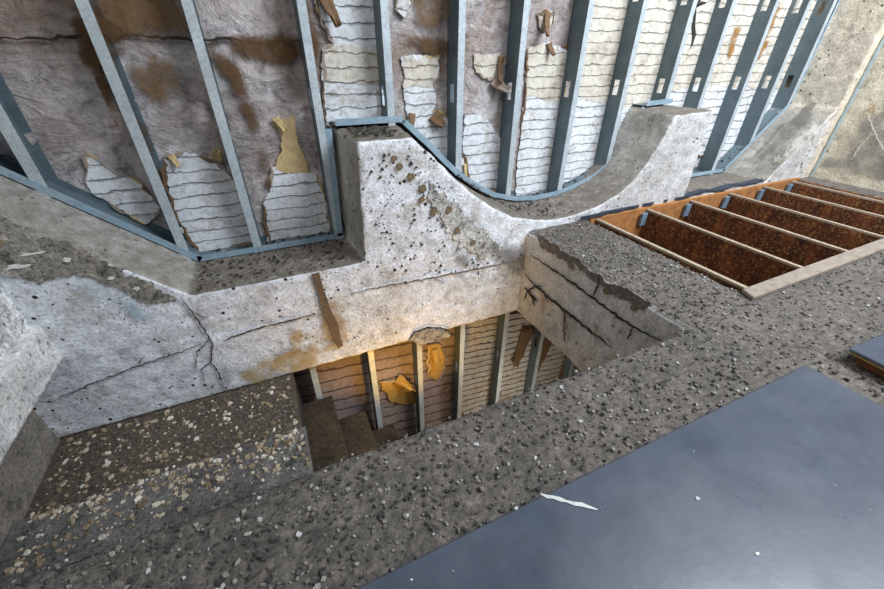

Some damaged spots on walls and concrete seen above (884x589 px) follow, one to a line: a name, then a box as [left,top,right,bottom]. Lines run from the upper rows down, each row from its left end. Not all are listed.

water stain [70,17,119,127]
water stain [90,0,187,76]
water stain [132,107,153,156]
water stain [208,33,302,132]
peeling [314,0,385,136]
peeling [400,54,448,159]
peeling [514,9,569,195]
peeling [563,0,822,184]
peeling [160,148,253,252]
crack [56,297,314,399]
crack [350,263,503,294]
crack [524,255,661,347]